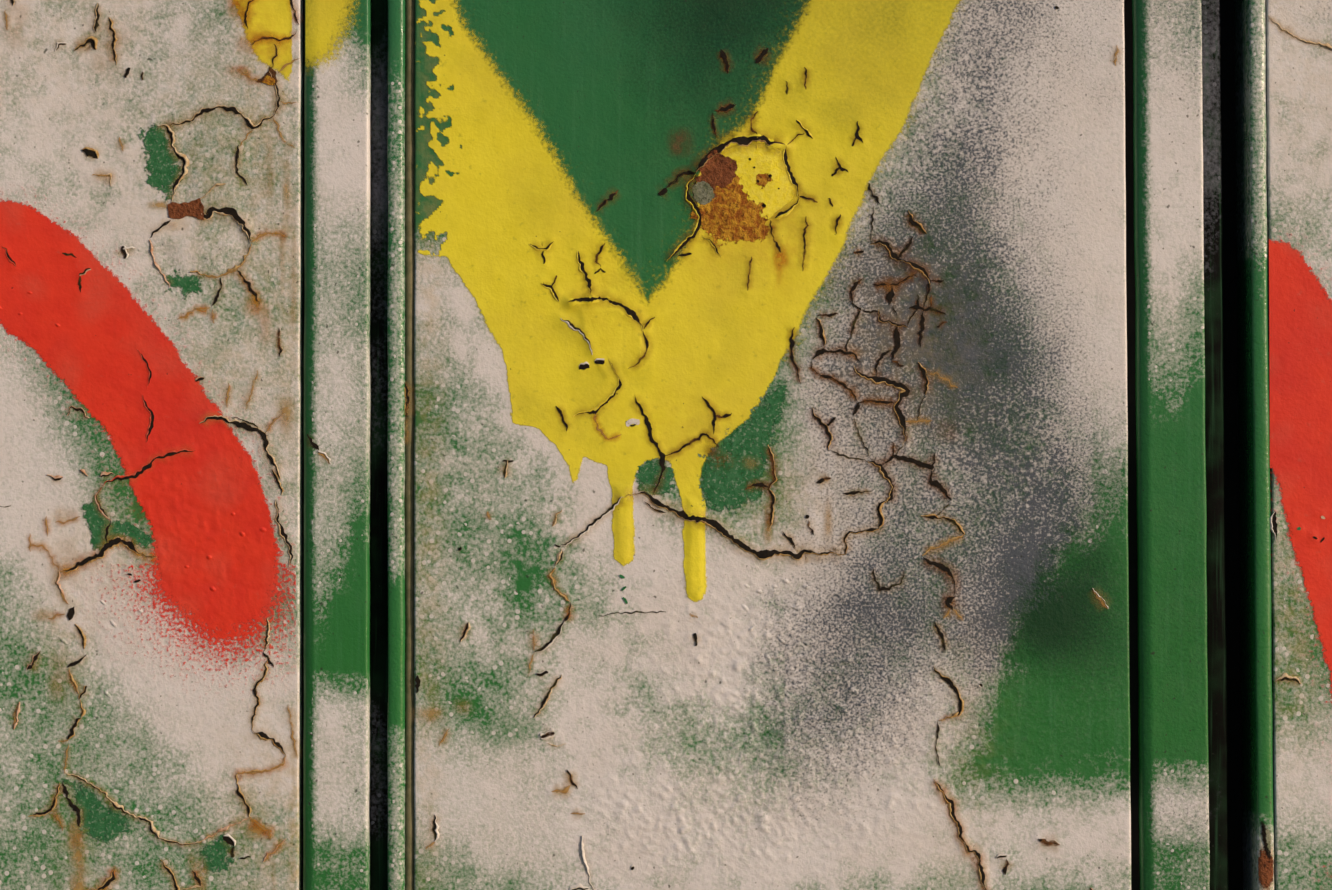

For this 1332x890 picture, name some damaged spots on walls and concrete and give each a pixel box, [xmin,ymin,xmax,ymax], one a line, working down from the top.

crack [82,137,123,185]
crack [149,0,300,323]
crack [2,246,16,267]
crack [63,253,91,292]
peeling [579,358,605,370]
crack [307,434,331,464]
crack [529,47,986,890]
crack [27,330,293,773]
crack [204,618,298,862]
crack [96,867,117,890]
crack [160,859,201,890]